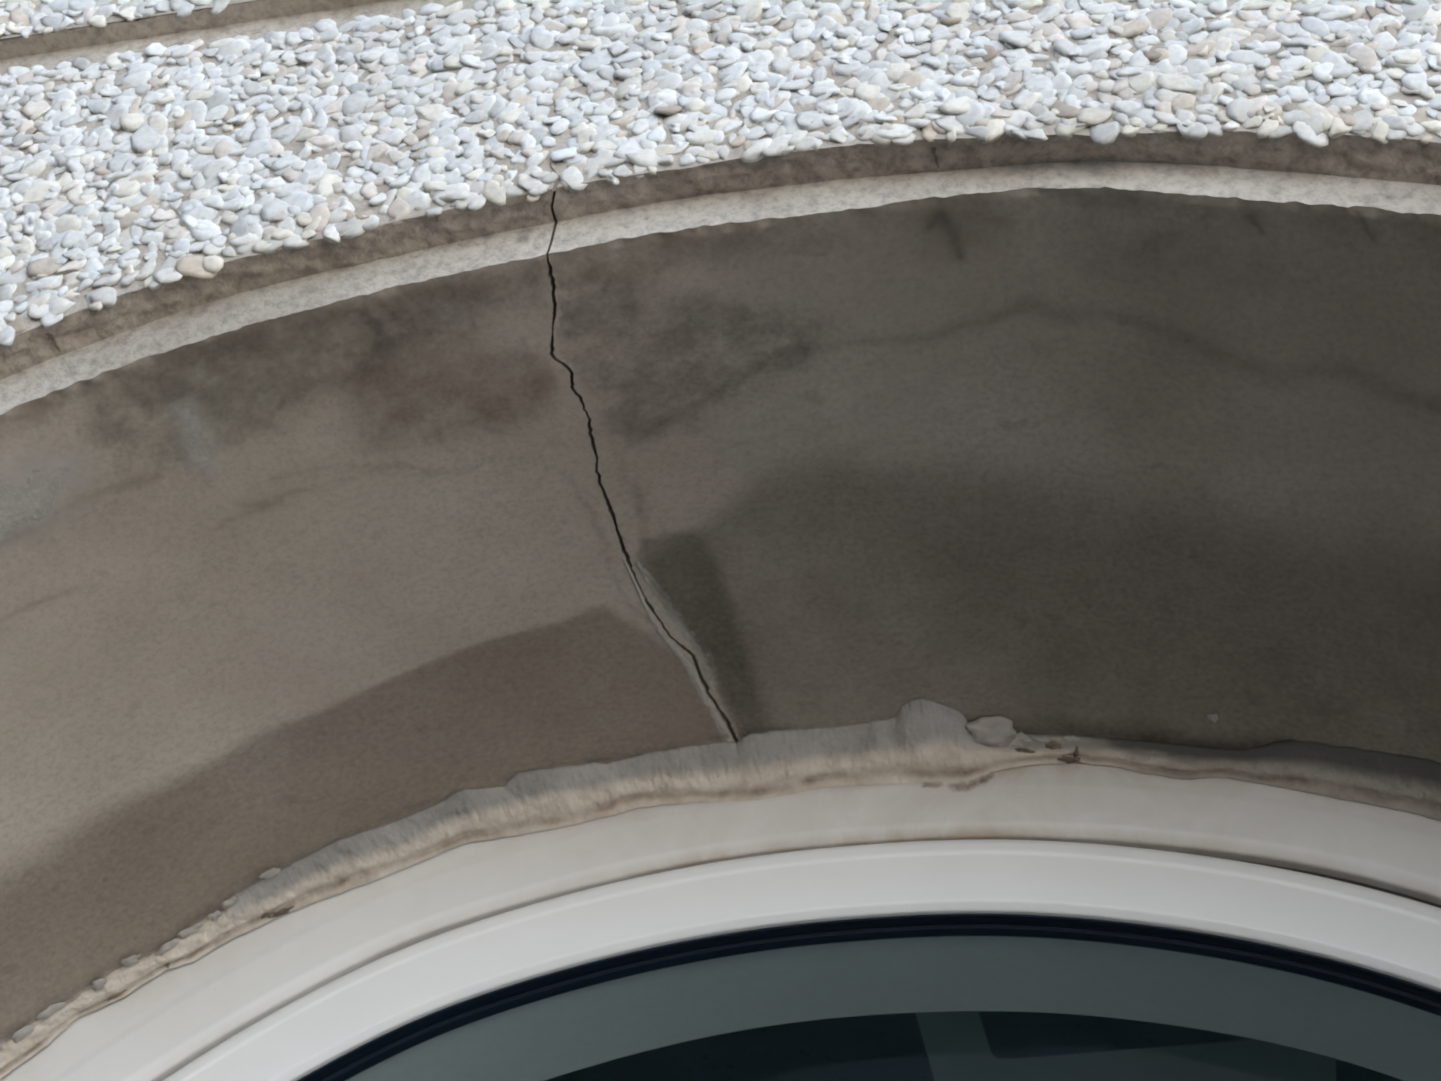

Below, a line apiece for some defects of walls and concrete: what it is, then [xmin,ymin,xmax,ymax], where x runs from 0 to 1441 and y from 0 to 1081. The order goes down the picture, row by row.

crack [546,162,739,743]